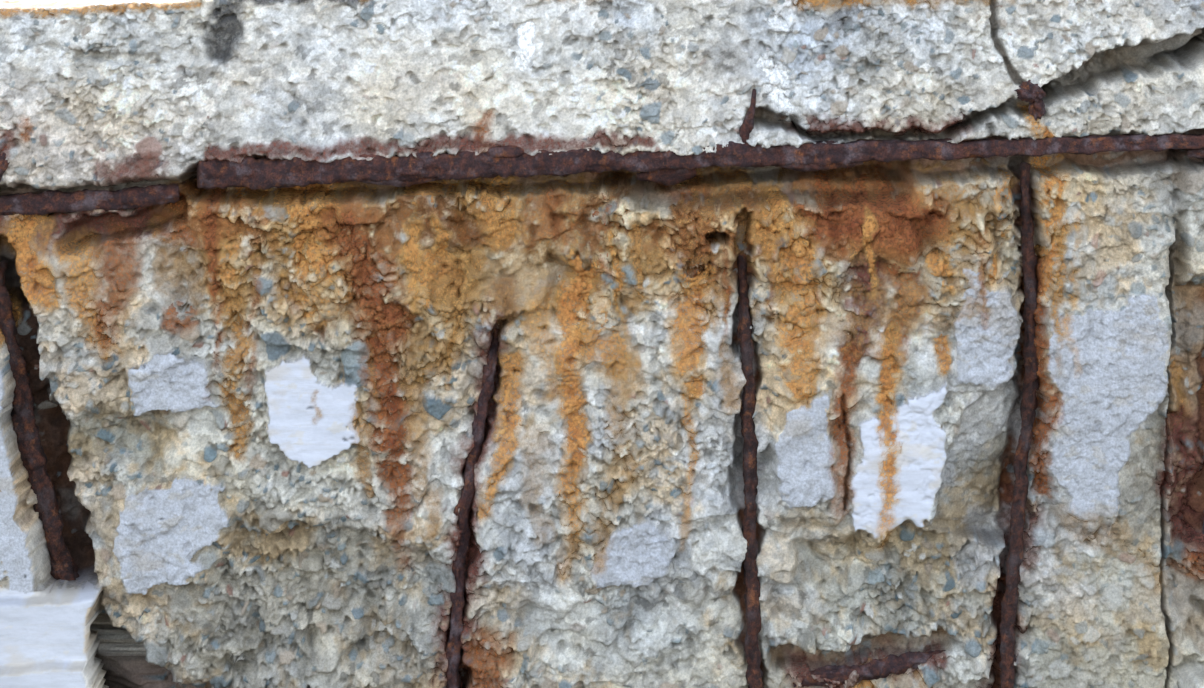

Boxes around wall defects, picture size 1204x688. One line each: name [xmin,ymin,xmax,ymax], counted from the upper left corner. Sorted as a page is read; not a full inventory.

corrosion [0,119,32,157]
corrosion [95,153,160,183]
corrosion [204,111,654,163]
spalling [0,0,1021,204]
corrosion [780,116,969,134]
crack [791,0,1204,144]
spalling [998,0,1204,87]
corrosion [0,161,1012,688]
spalling [0,165,1026,688]
spalling [821,149,1204,688]
corrosion [984,155,1078,688]
corrosion [1155,362,1204,580]